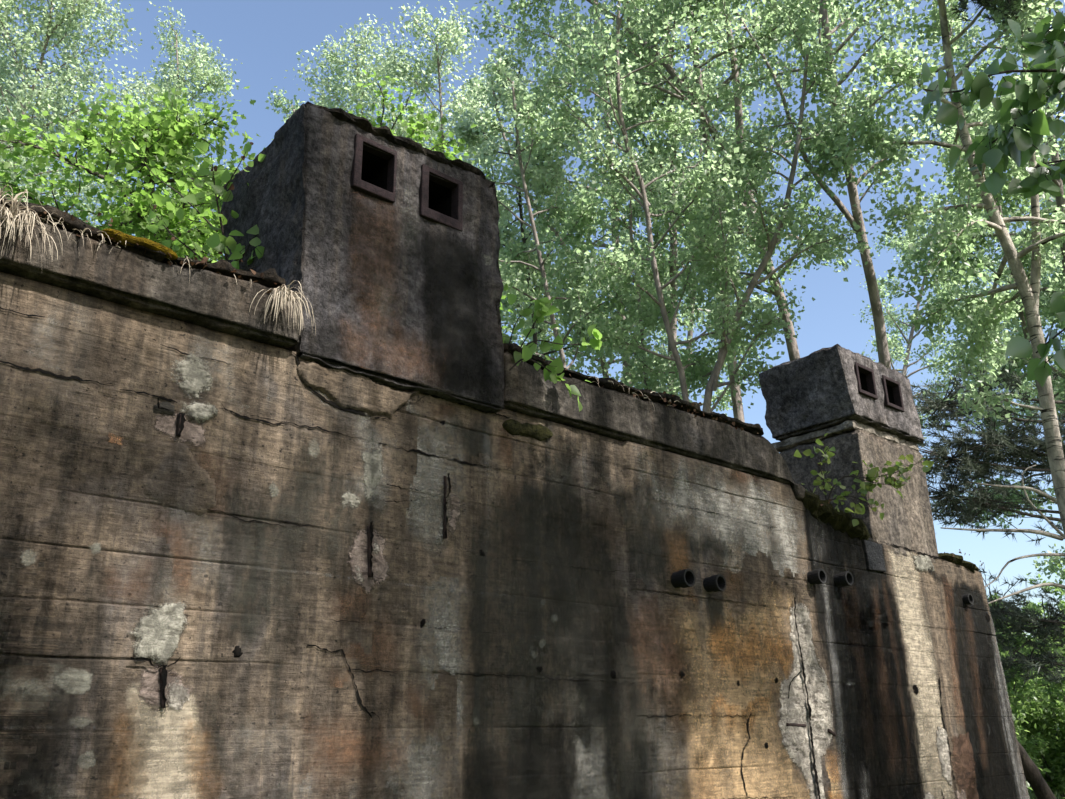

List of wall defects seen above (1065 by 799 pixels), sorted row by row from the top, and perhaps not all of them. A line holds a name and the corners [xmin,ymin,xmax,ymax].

water stain [413,215,499,404]
crack [0,360,177,403]
spalling [153,353,218,447]
crack [221,347,513,470]
spalling [130,602,192,712]
spalling [348,521,390,595]
crack [307,644,629,720]
water stain [424,435,666,799]
crack [643,714,808,799]
spalling [778,598,837,799]
water stain [804,507,923,799]
water stain [928,568,1022,799]